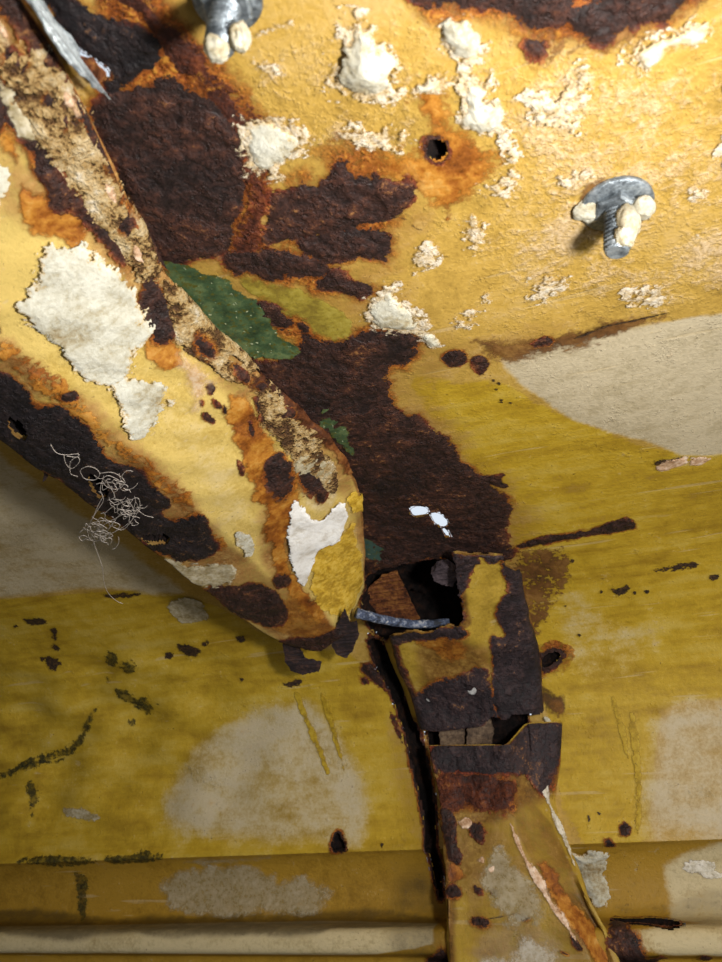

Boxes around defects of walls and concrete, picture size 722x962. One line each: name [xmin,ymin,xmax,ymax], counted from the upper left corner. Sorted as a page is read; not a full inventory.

rust [405,0,706,65]
rust [0,0,504,303]
peeling [0,20,339,494]
rust [136,277,183,371]
rust [0,328,227,563]
rust [201,299,666,904]
rust [426,948,448,962]
rust [469,916,491,929]
peeling [479,824,576,941]
rust [537,861,685,962]